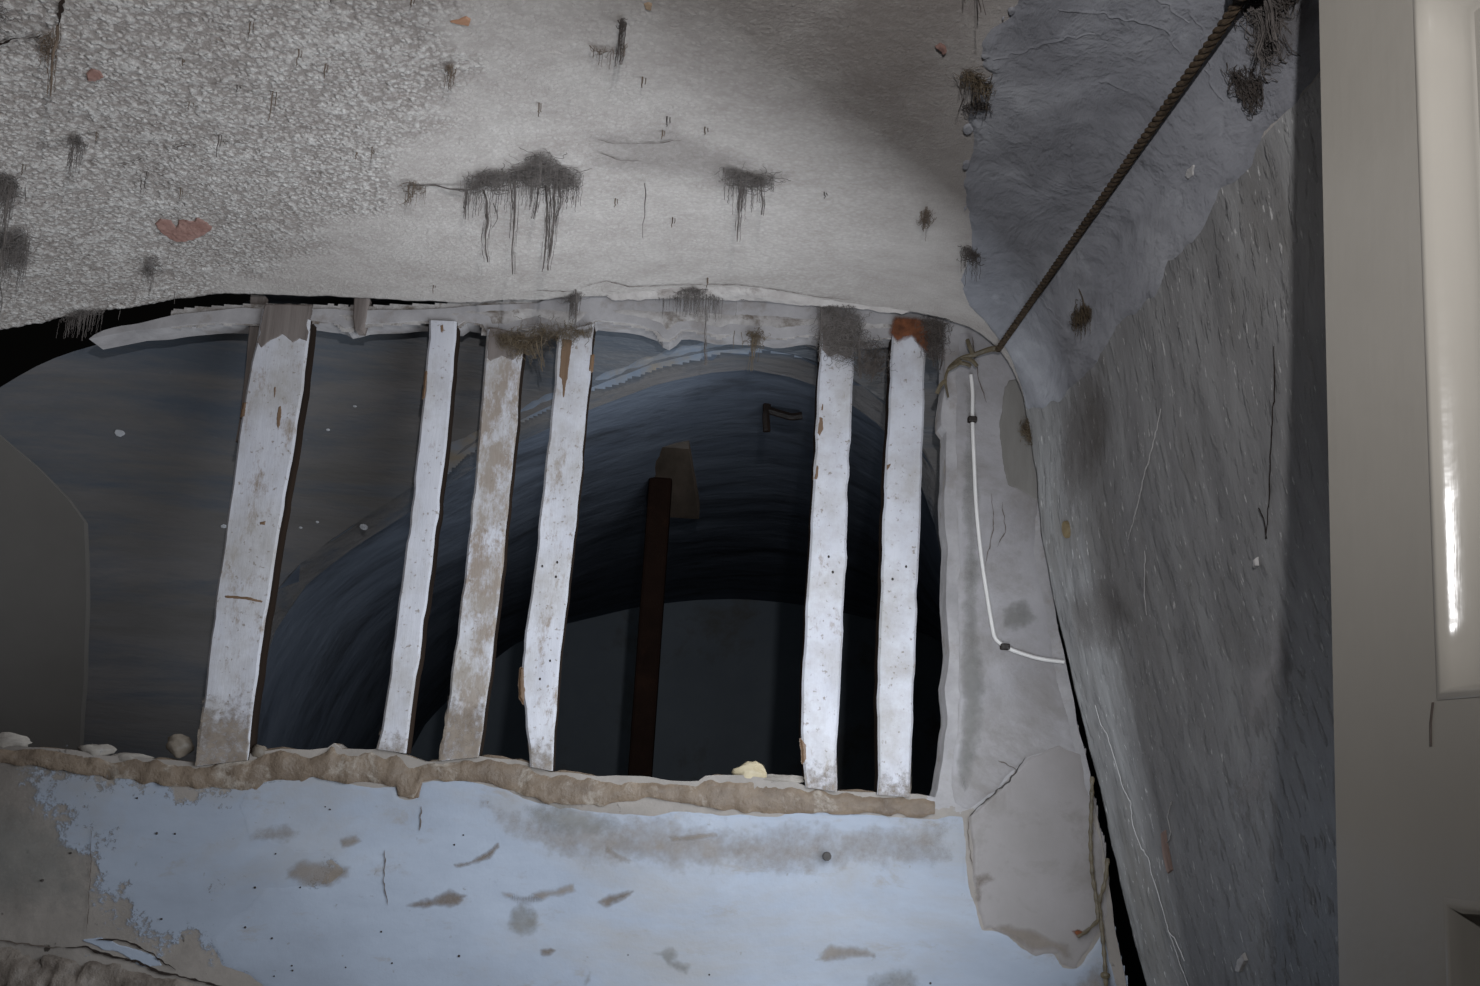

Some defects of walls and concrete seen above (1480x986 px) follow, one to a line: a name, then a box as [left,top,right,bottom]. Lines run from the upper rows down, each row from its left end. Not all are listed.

crack [0,0,65,45]
peeling [961,0,1320,409]
rust [890,317,932,353]